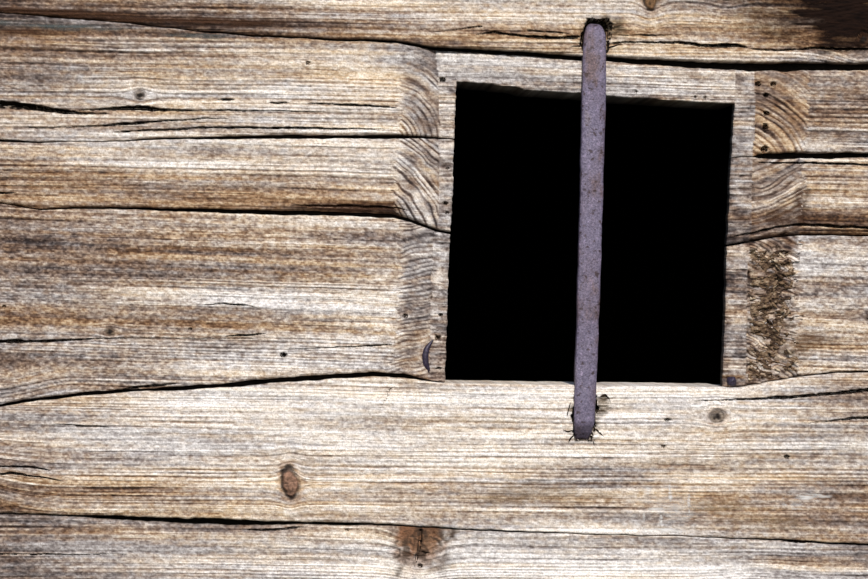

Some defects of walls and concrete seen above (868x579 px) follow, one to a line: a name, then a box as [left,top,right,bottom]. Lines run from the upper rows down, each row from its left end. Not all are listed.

crack [0,98,396,133]
crack [0,333,266,344]
crack [116,382,177,390]
crack [698,388,868,401]
crack [813,415,868,423]
crack [58,422,108,430]
crack [0,465,61,481]